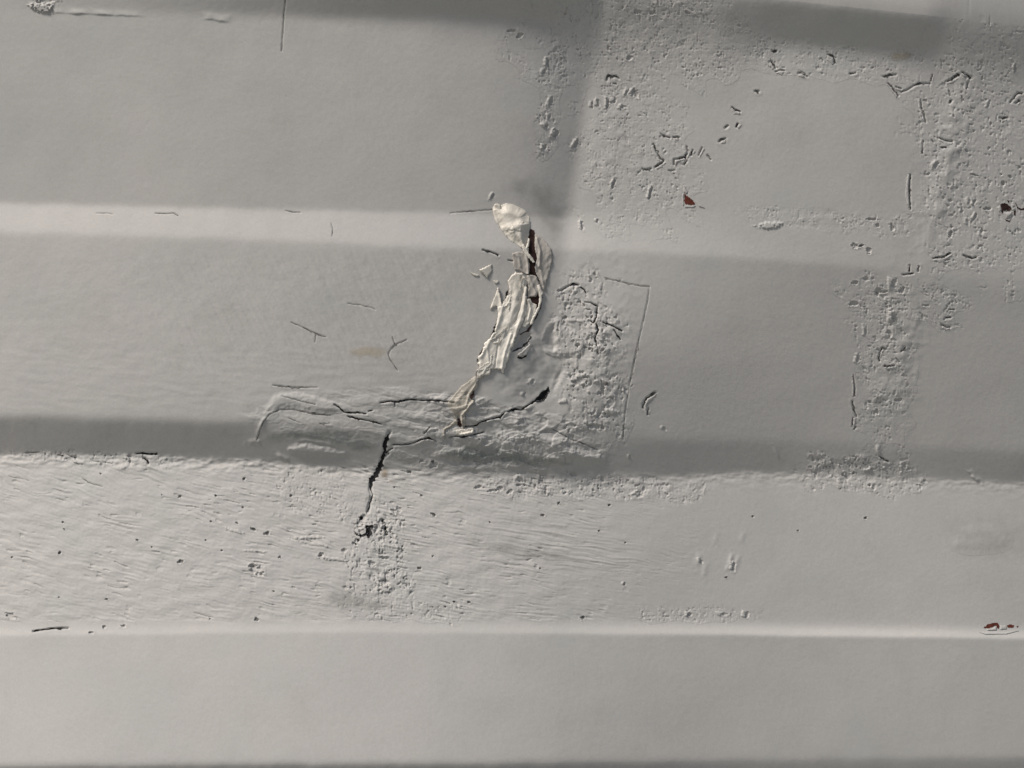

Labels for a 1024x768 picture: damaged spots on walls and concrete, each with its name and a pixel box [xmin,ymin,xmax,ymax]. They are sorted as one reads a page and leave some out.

peeling [470,264,502,308]
spalling [481,0,1024,504]
crack [257,385,535,512]